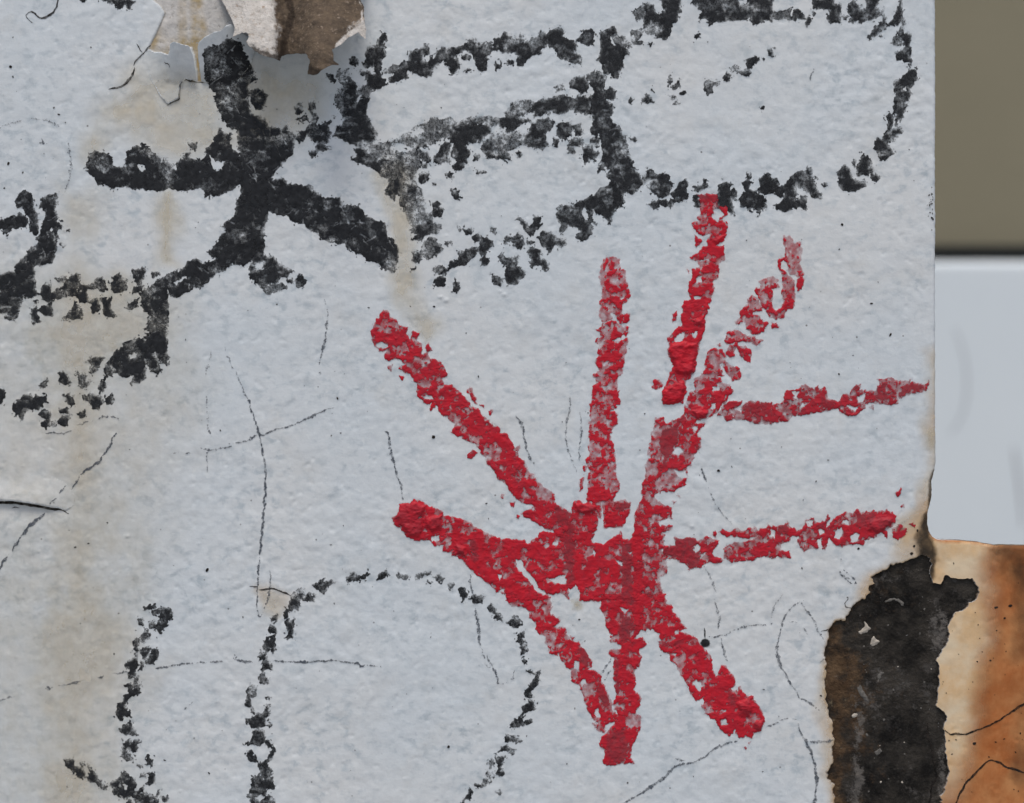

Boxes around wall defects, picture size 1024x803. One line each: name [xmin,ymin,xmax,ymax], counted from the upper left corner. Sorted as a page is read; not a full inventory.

peeling [144,0,366,104]
crack [0,501,69,514]
crack [250,586,291,596]
rust [901,514,1024,803]